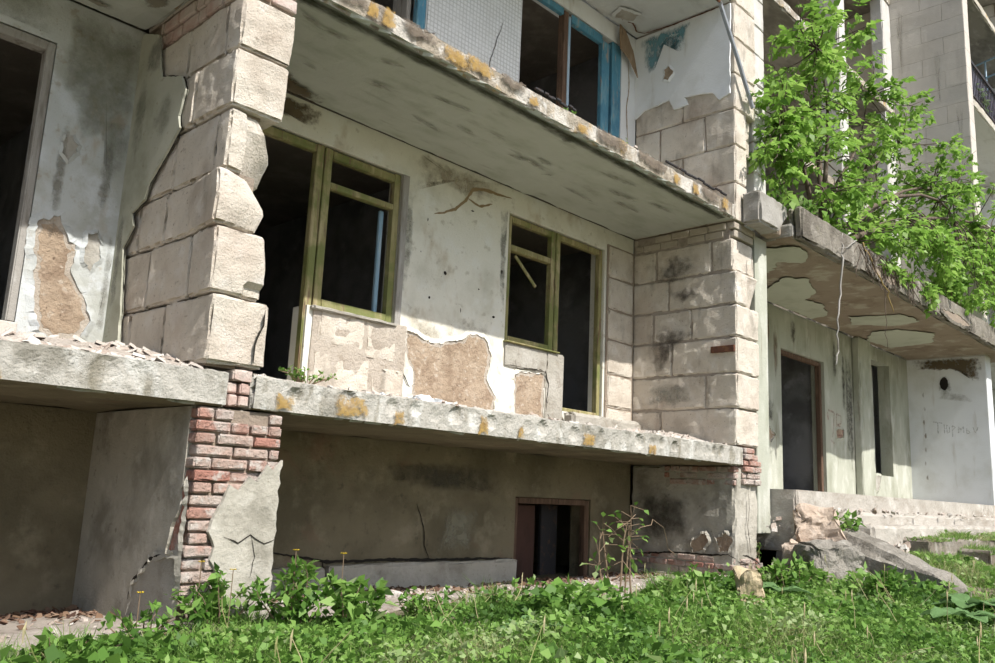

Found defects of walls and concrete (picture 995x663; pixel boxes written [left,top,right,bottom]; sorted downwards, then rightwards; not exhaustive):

flaking render [634,3,731,120]
crack [120,46,188,338]
crack [434,188,512,214]
peeling [766,247,828,319]
spalling [867,262,901,291]
peeling [848,314,935,348]
spalling [941,306,972,330]
flaking render [404,326,546,418]
flaking render [123,407,283,624]